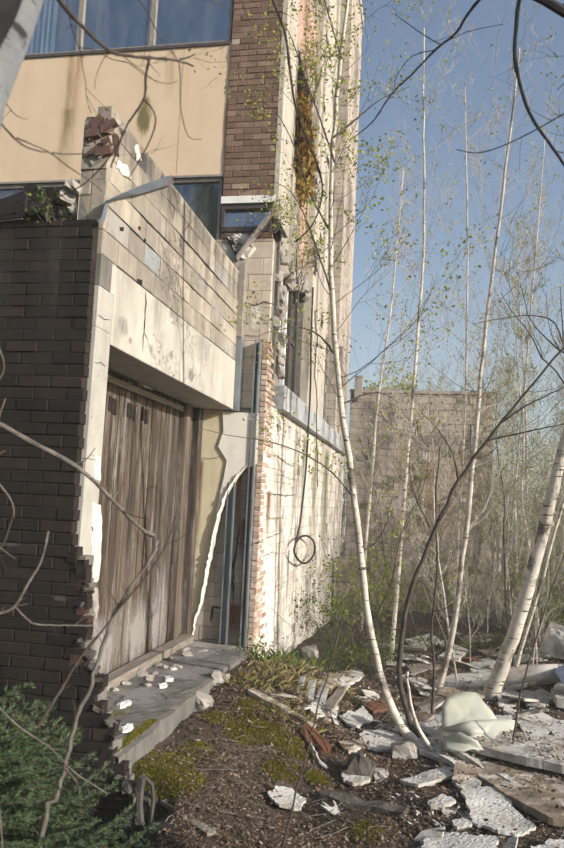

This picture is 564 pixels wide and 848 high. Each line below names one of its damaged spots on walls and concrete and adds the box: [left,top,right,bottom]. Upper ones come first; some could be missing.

peeling [298,0,316,75]
spalling [83,113,142,179]
water stain [138,98,150,132]
spalling [317,155,330,205]
peeling [191,201,322,657]
spalling [63,502,157,848]
peeling [157,666,177,689]